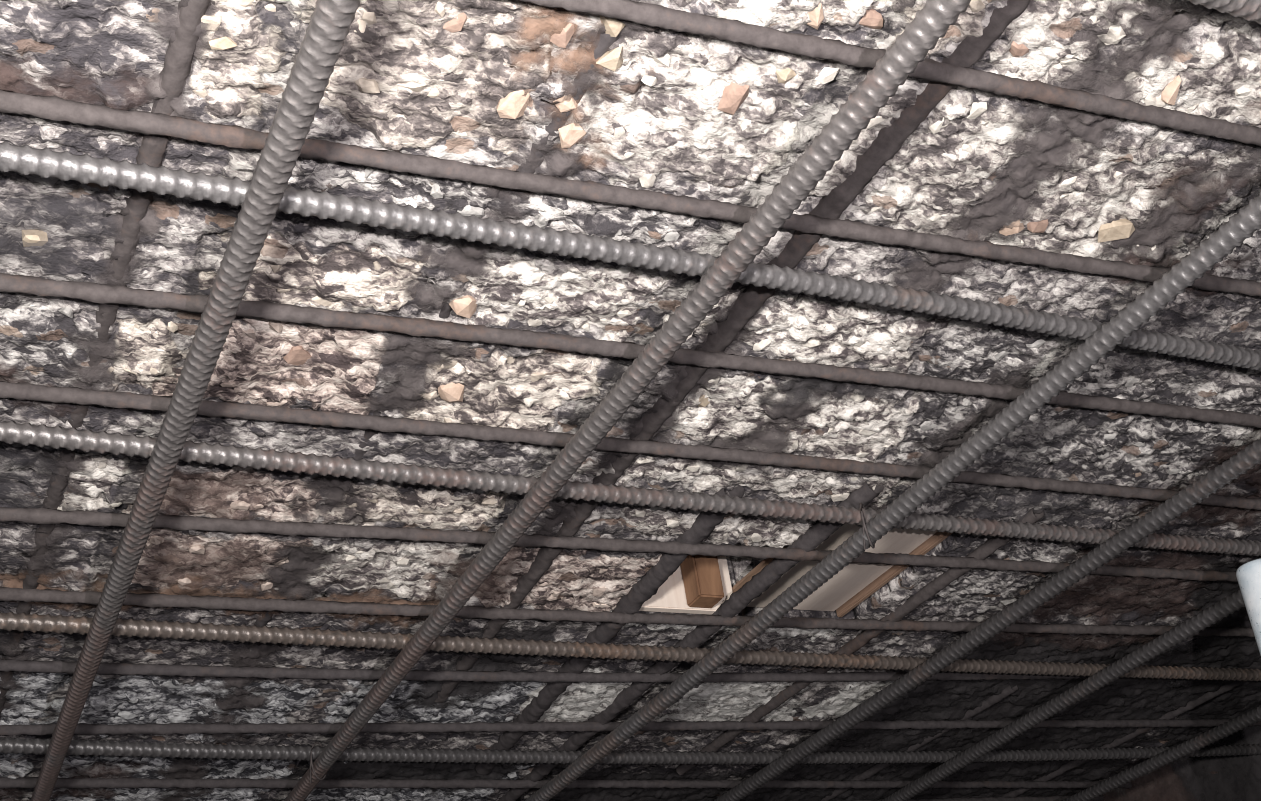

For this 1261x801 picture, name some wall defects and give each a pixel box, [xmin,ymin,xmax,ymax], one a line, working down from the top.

damp [590,19,654,37]
damp [1060,0,1226,100]
damp [892,104,1120,294]
damp [1102,141,1261,267]
damp [405,238,494,312]
spalling [0,0,721,801]
damp [363,331,466,413]
damp [703,382,847,469]
damp [899,358,1035,468]
damp [288,475,372,523]
damp [264,536,342,600]
damp [199,641,285,743]